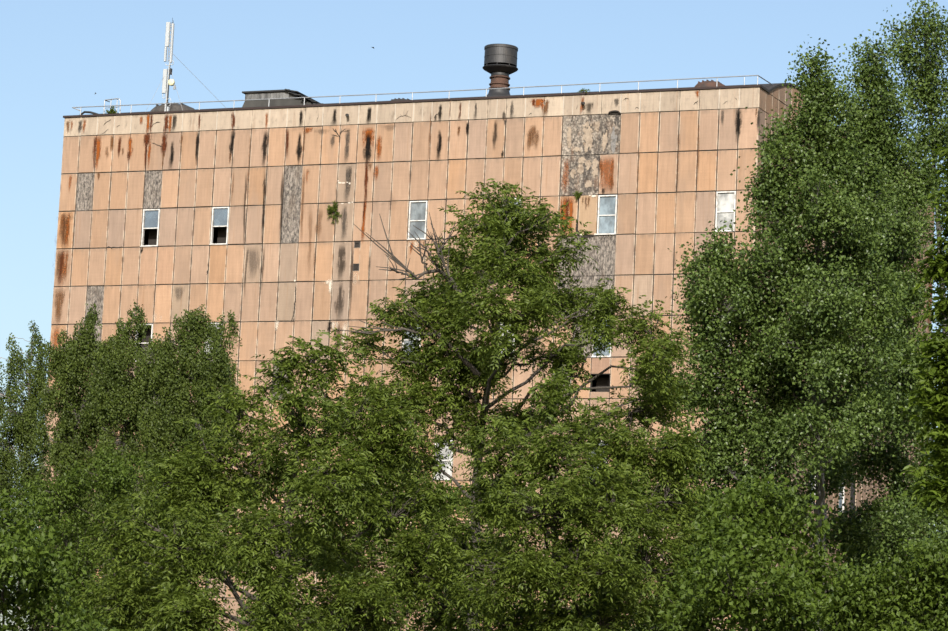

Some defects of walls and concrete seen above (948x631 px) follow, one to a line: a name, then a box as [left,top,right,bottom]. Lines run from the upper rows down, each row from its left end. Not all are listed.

rust [93,137,133,179]
rust [140,115,172,166]
rust [361,129,382,236]
spalling [560,114,621,197]
rust [601,162,613,193]
rust [61,216,69,240]